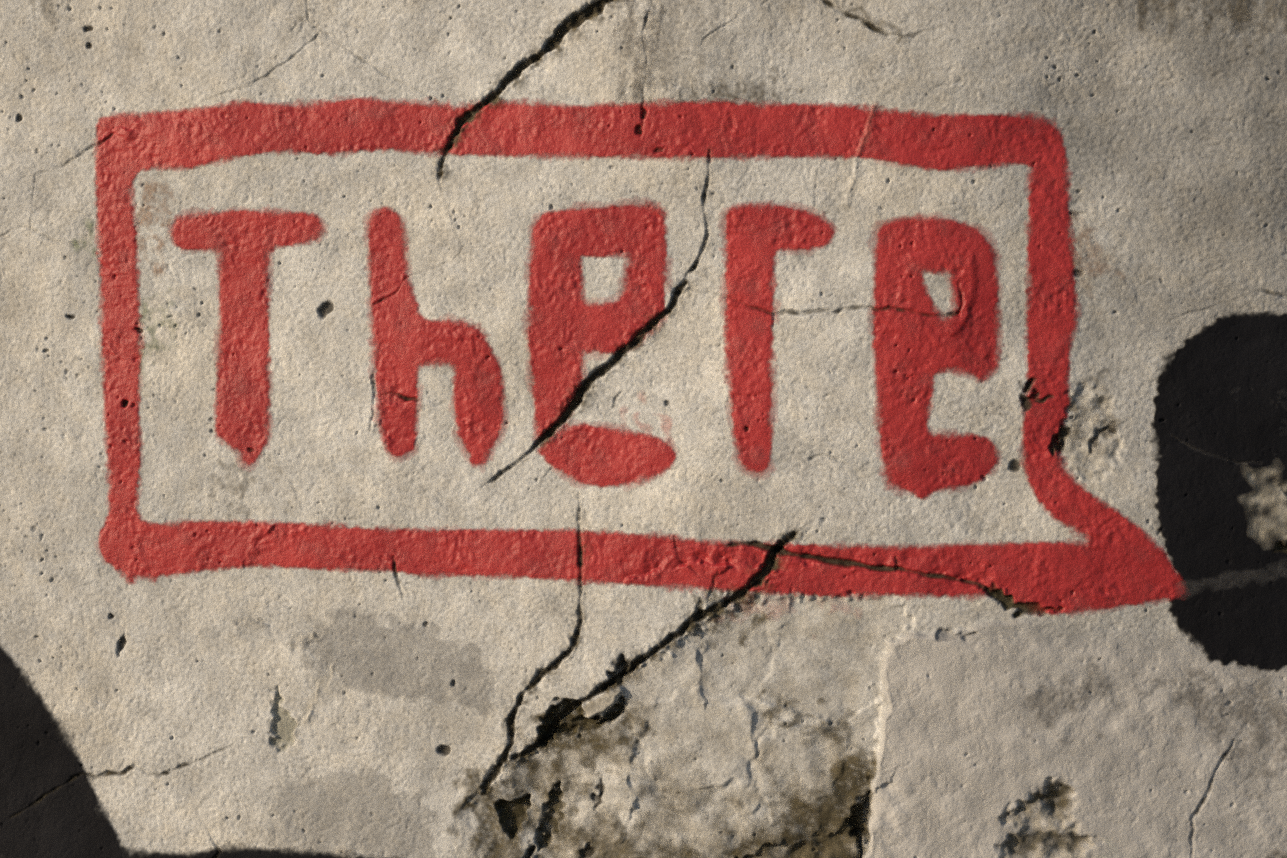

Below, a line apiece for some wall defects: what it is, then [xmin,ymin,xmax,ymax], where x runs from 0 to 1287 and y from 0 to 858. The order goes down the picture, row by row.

crack [439,0,618,177]
crack [823,0,880,32]
crack [492,235,708,481]
crack [787,306,903,314]
spalling [1245,469,1287,552]
crack [482,531,987,794]
spalling [453,654,876,858]
spalling [1004,784,1089,858]